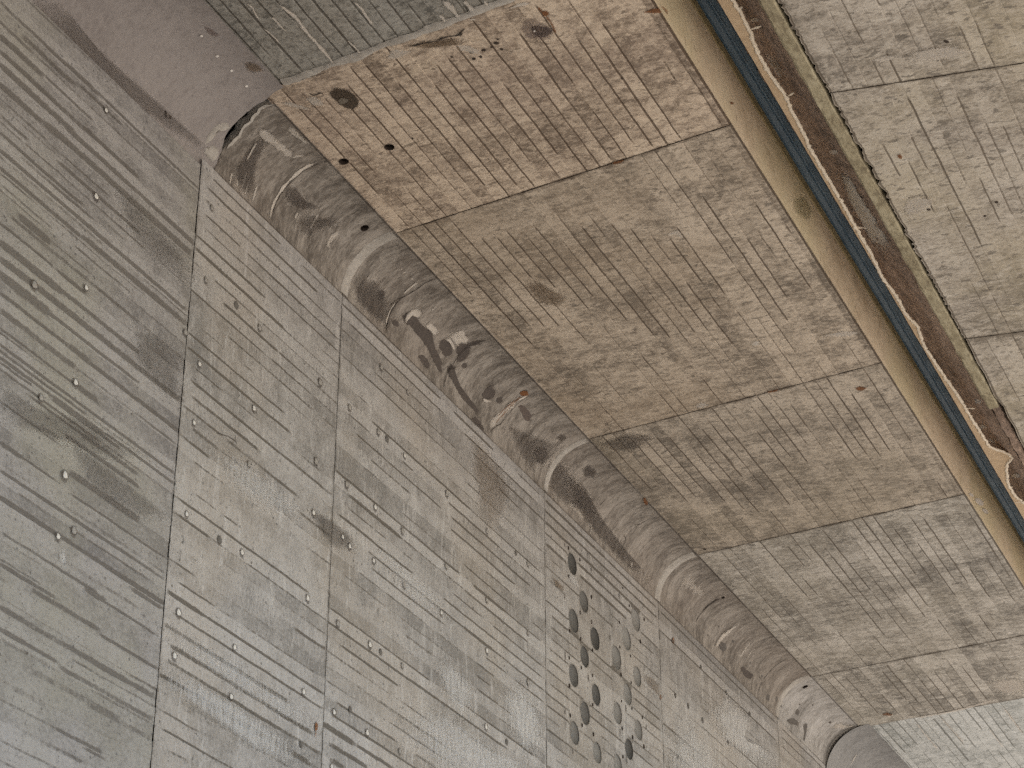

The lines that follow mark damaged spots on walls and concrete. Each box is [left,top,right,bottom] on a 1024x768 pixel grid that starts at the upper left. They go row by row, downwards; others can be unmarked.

spalling [736,0,1024,519]
water stain [580,494,633,567]